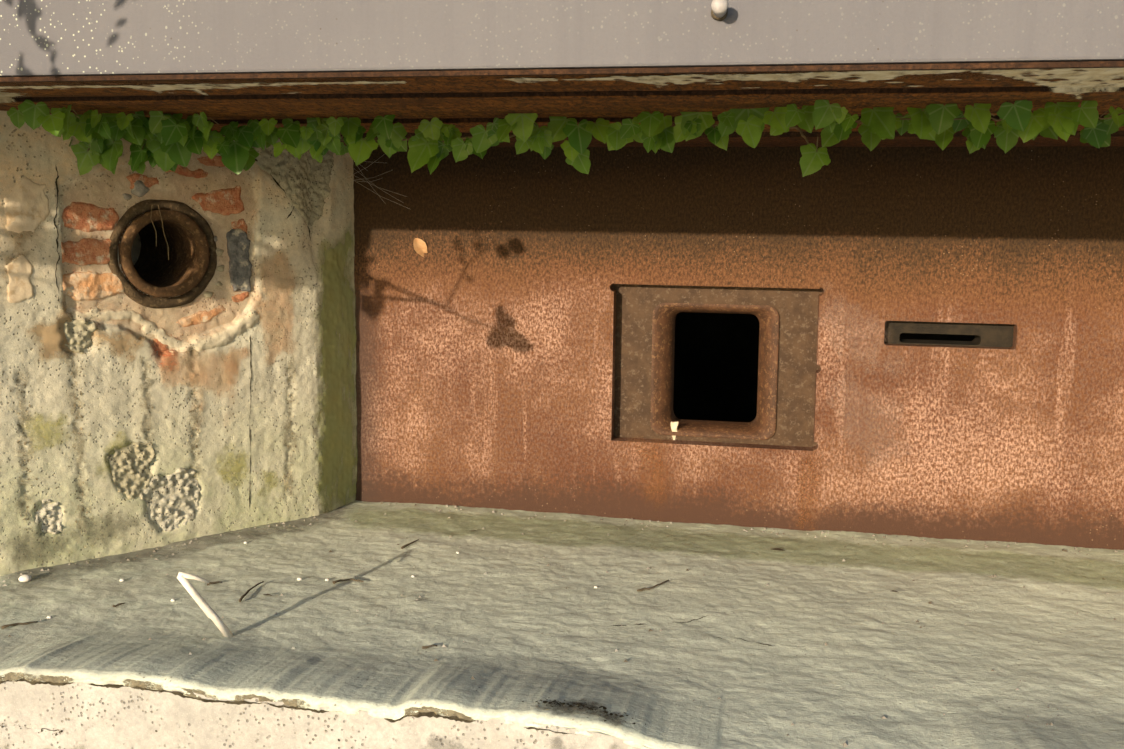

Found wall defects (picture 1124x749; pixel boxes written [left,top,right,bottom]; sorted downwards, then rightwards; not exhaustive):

peeling [0,81,407,103]
peeling [505,68,1124,99]
spalling [4,139,334,355]
crack [246,336,254,507]
crack [0,678,329,713]
crack [384,712,475,723]
crack [524,727,576,735]